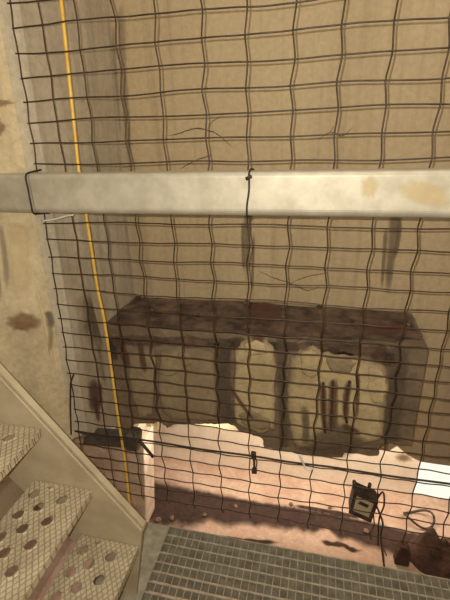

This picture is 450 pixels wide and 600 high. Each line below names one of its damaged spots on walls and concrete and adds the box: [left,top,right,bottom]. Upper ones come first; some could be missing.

crack [168,118,232,147]
water stain [242,217,254,285]
water stain [382,217,401,281]
crack [264,272,328,291]
rust [321,375,360,434]